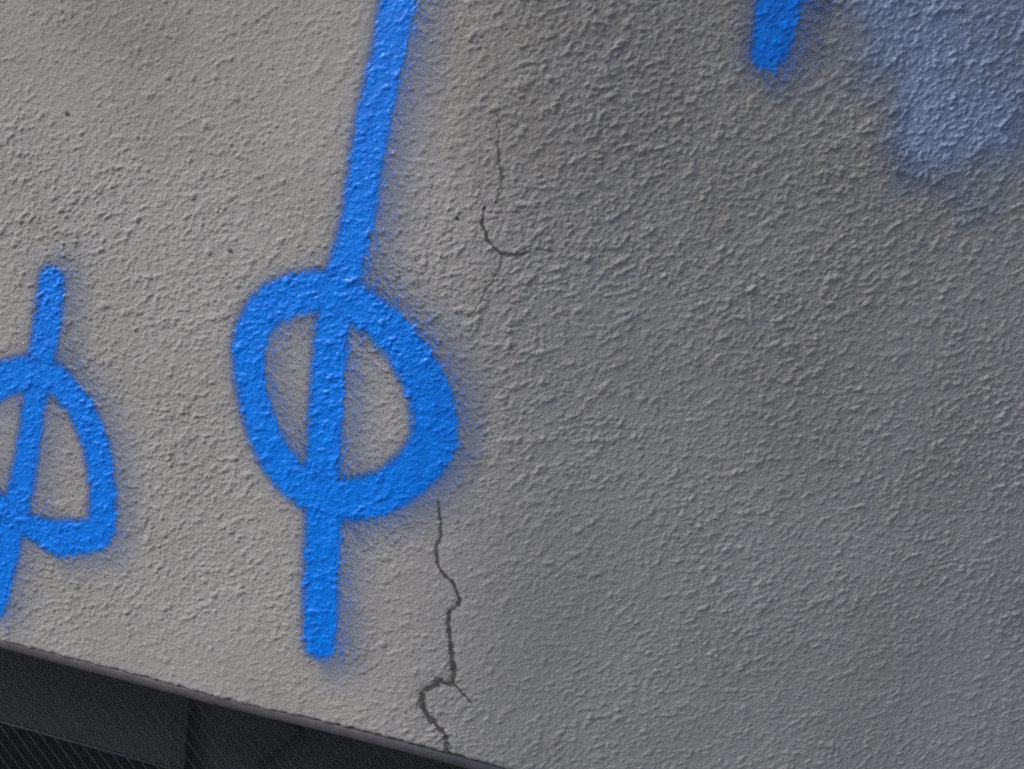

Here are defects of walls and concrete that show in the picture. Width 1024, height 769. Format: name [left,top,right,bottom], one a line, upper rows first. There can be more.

crack [469,113,556,316]
crack [419,501,472,753]